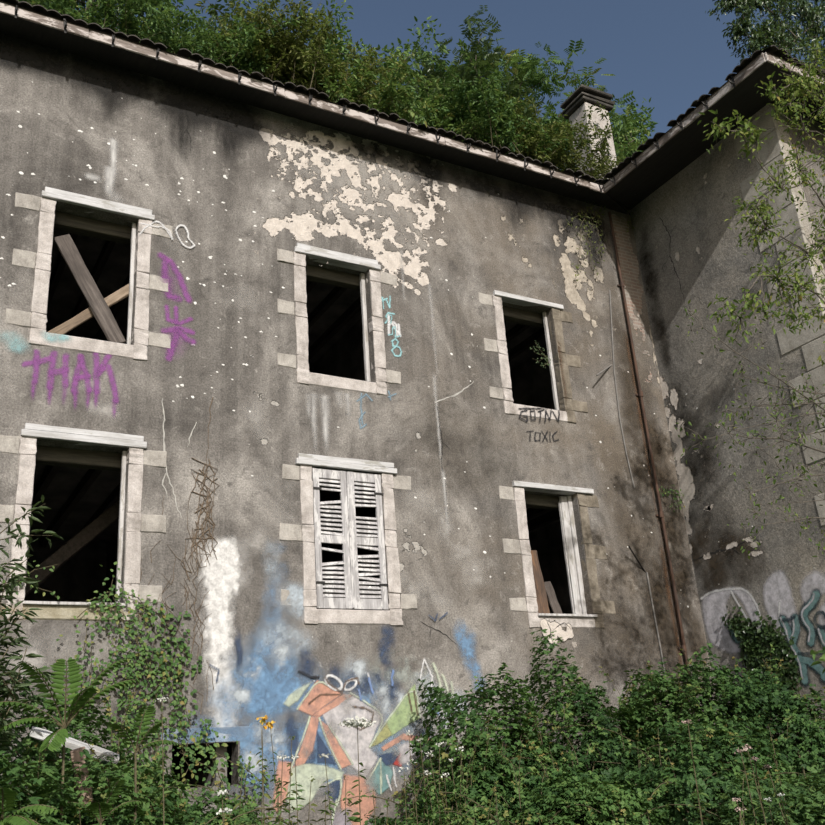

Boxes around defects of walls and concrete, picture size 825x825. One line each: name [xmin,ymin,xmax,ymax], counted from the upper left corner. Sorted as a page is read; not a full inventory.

flaking render [239,127,457,296]
flaking render [552,220,604,347]
leakage [640,253,657,301]
leakage [653,316,670,365]
flaking render [611,214,714,554]
leakage [675,386,688,430]
flaking render [718,526,763,564]
leakage [203,538,240,742]
flaking render [540,617,577,647]